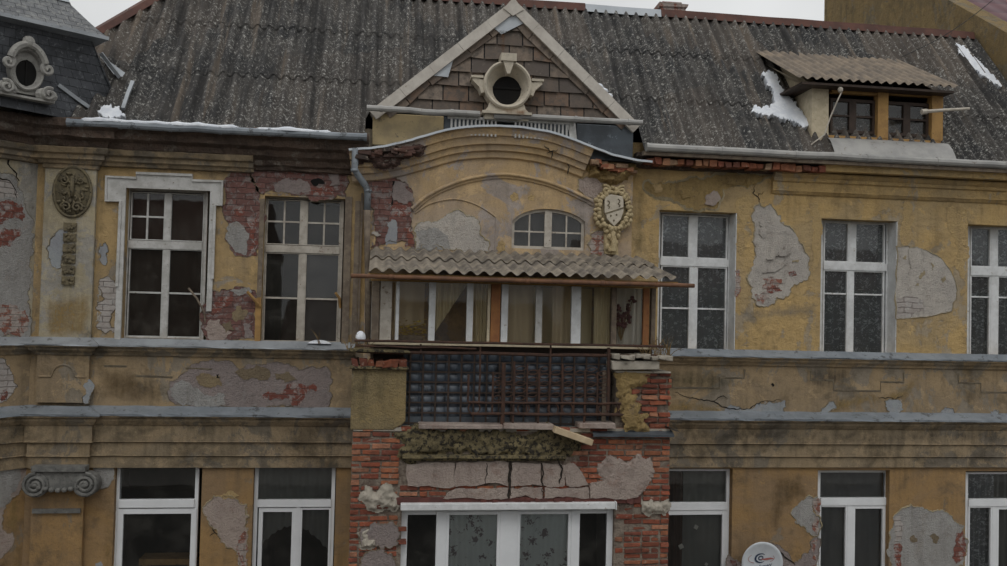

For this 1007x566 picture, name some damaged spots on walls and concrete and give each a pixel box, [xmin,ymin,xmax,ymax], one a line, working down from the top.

flaking render [221,170,350,258]
spalling [368,178,506,253]
flaking render [577,159,772,213]
flaking render [0,172,35,337]
flaking render [199,286,257,340]
flaking render [734,201,823,308]
flaking render [894,245,958,319]
flaking render [167,358,333,408]
crack [675,392,779,410]
flaking render [202,490,250,566]
flaking render [771,495,823,566]
flaking render [886,504,969,566]